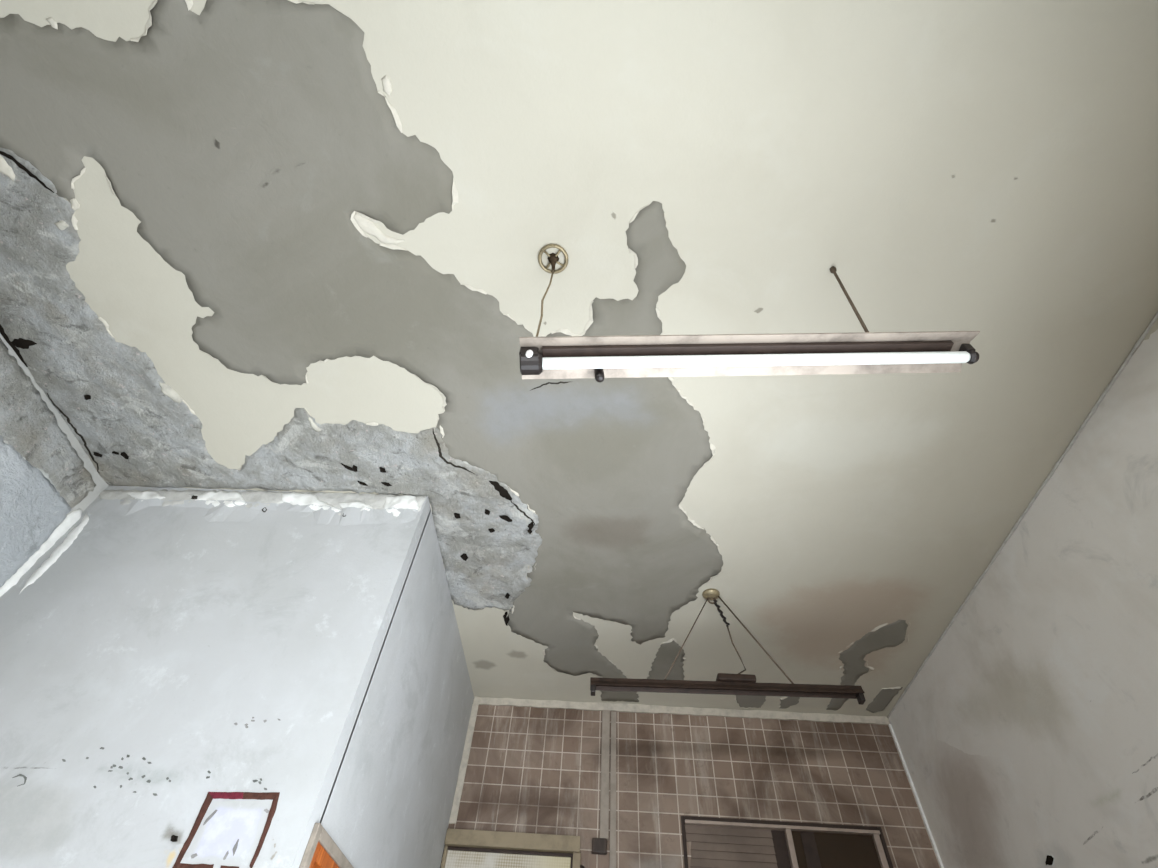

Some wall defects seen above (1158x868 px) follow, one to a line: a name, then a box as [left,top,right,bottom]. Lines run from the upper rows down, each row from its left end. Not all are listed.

peeling [0,0,723,703]
peeling [826,620,911,714]